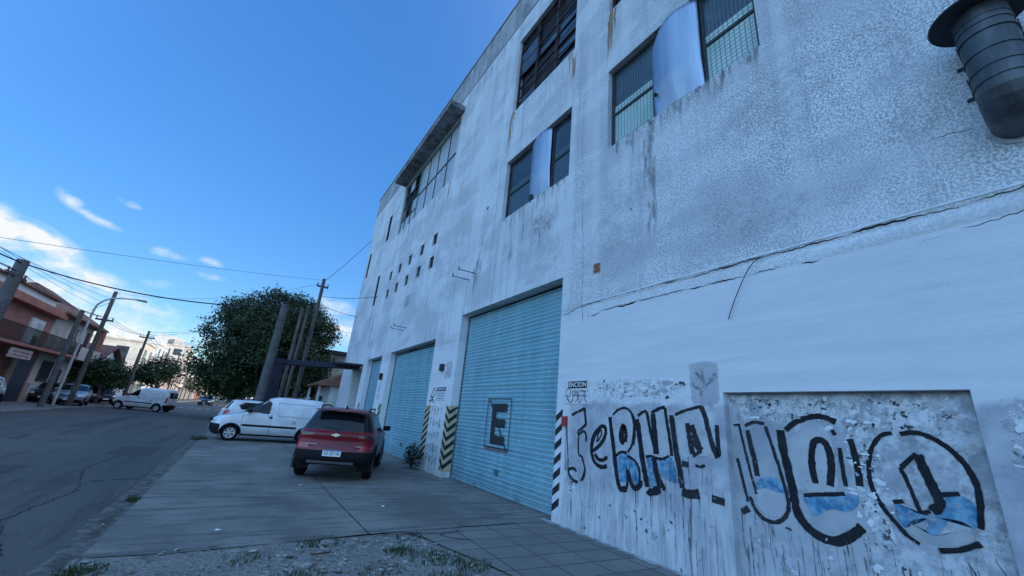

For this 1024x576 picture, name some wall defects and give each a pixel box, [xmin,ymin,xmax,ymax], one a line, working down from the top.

rust [607,7,616,48]
crack [564,185,1024,321]
peeling [591,372,715,401]
peeling [743,396,959,576]